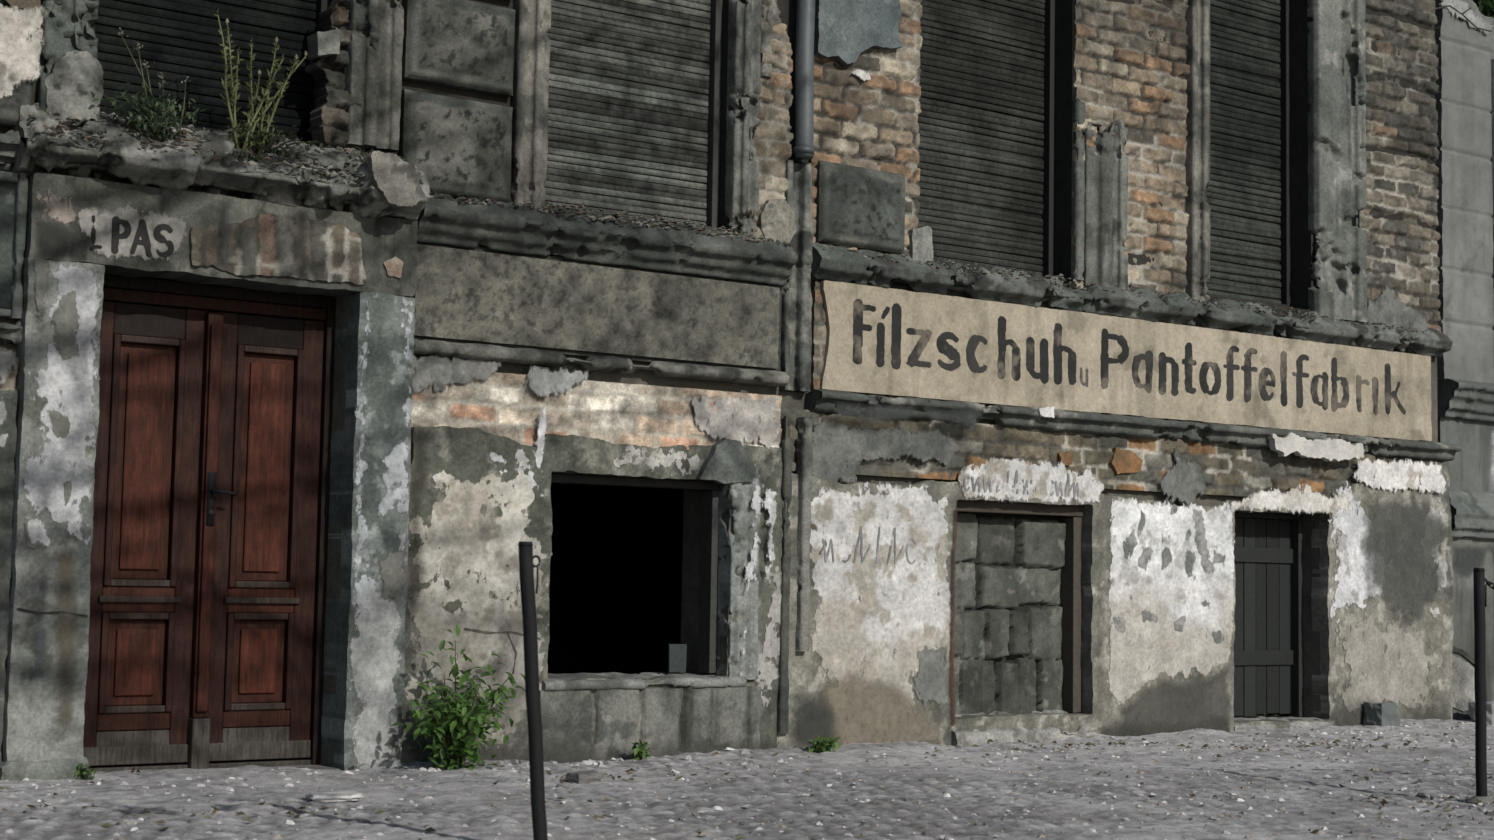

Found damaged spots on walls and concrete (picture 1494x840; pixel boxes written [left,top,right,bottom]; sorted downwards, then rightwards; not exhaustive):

flaking render [0,0,104,125]
peeling [0,191,1448,770]
flaking render [1452,655,1494,725]